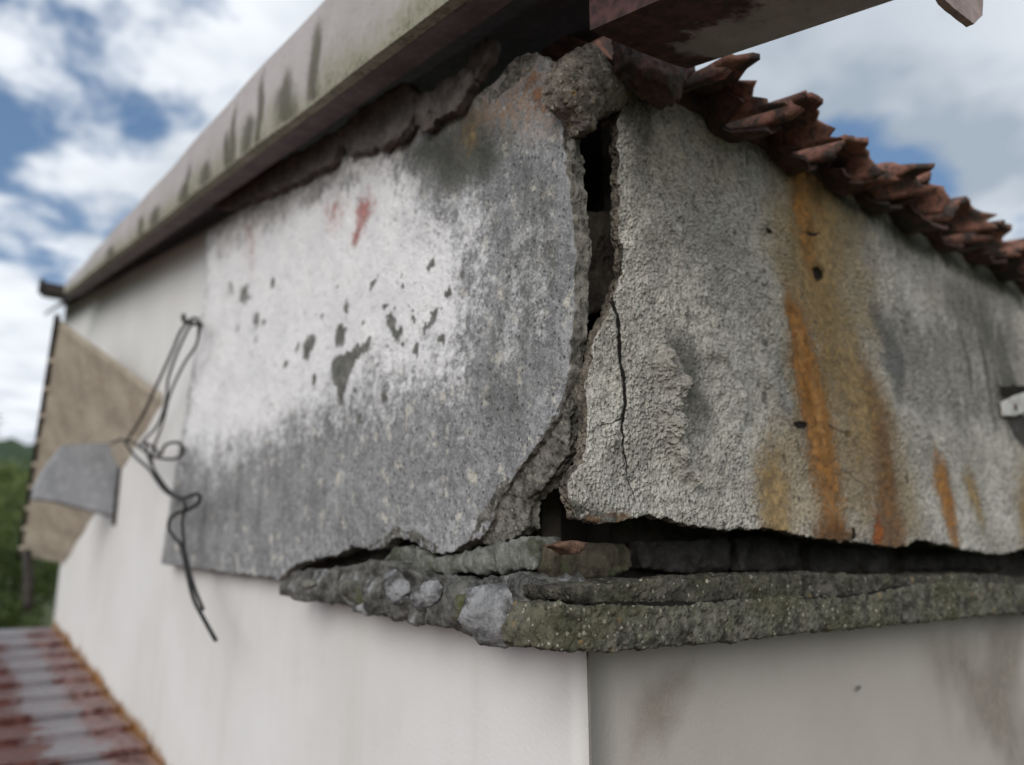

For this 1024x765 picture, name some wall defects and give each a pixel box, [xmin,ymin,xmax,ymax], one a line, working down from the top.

damp [224,83,263,165]
damp [279,75,291,121]
damp [308,28,320,97]
crack [566,120,604,212]
peeling [283,335,317,368]
peeling [331,285,371,405]
peeling [382,304,445,359]
corrosion [784,172,905,547]
crack [583,301,636,504]
crack [561,501,613,543]
corrosion [756,451,789,531]
corrosion [933,452,959,548]